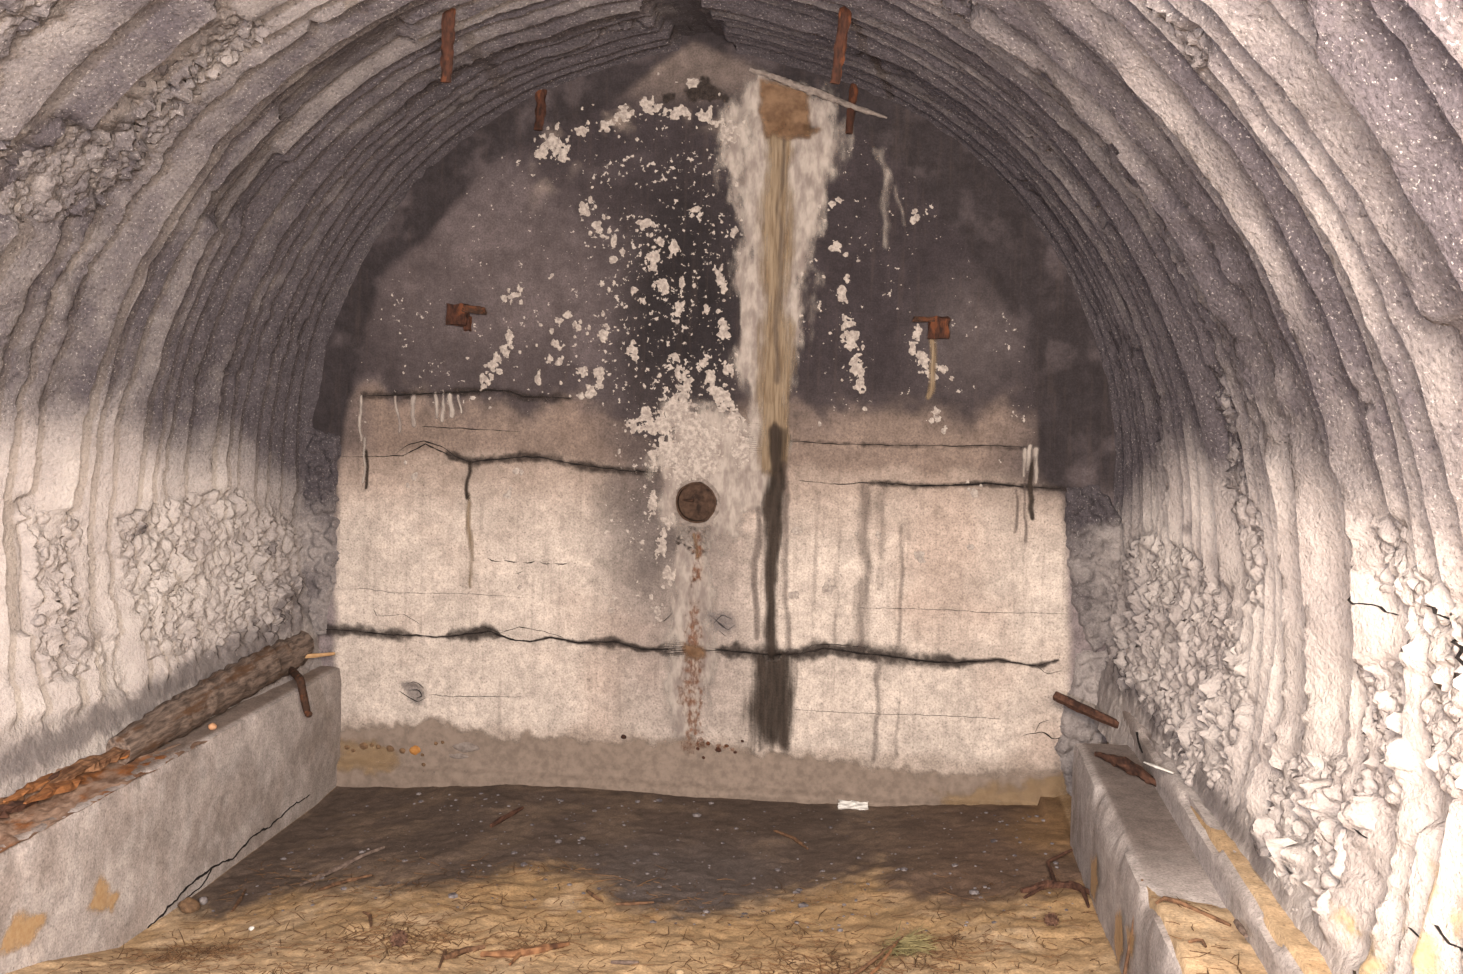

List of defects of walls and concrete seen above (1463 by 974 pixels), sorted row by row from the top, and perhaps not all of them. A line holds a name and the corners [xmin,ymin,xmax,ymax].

spalling [0,0,263,223]
spalling [18,505,90,685]
spalling [107,425,341,661]
crack [343,389,656,477]
crack [318,558,1059,674]
corrosion [693,533,702,580]
leakage [337,75,1068,807]
corrosion [682,607,732,750]
crack [790,441,1064,491]
spalling [1054,368,1266,796]
spalling [1259,513,1463,913]
crack [1347,596,1463,665]